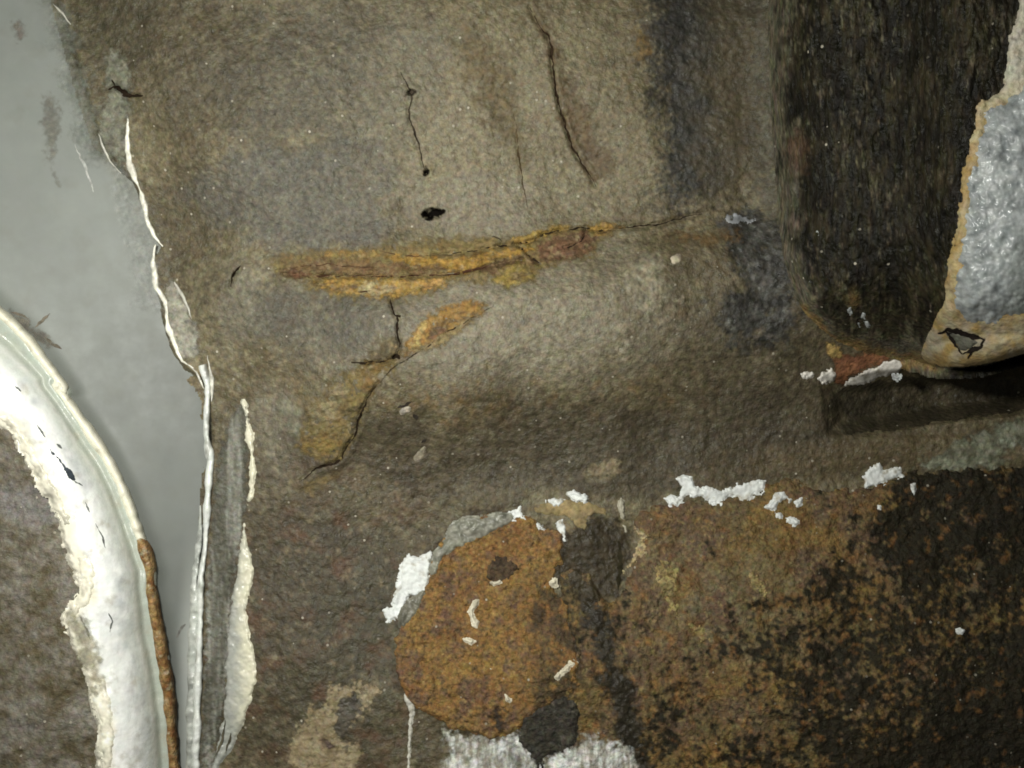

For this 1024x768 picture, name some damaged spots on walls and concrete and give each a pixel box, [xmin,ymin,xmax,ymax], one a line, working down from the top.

crack [400,72,426,171]
crack [529,7,596,186]
peeling [98,118,214,401]
corrosion [295,299,488,462]
corrosion [271,221,621,302]
crack [286,214,700,481]
peeling [800,360,902,386]
spalling [938,328,985,359]
corrosion [137,538,181,768]
corrosion [394,507,581,740]